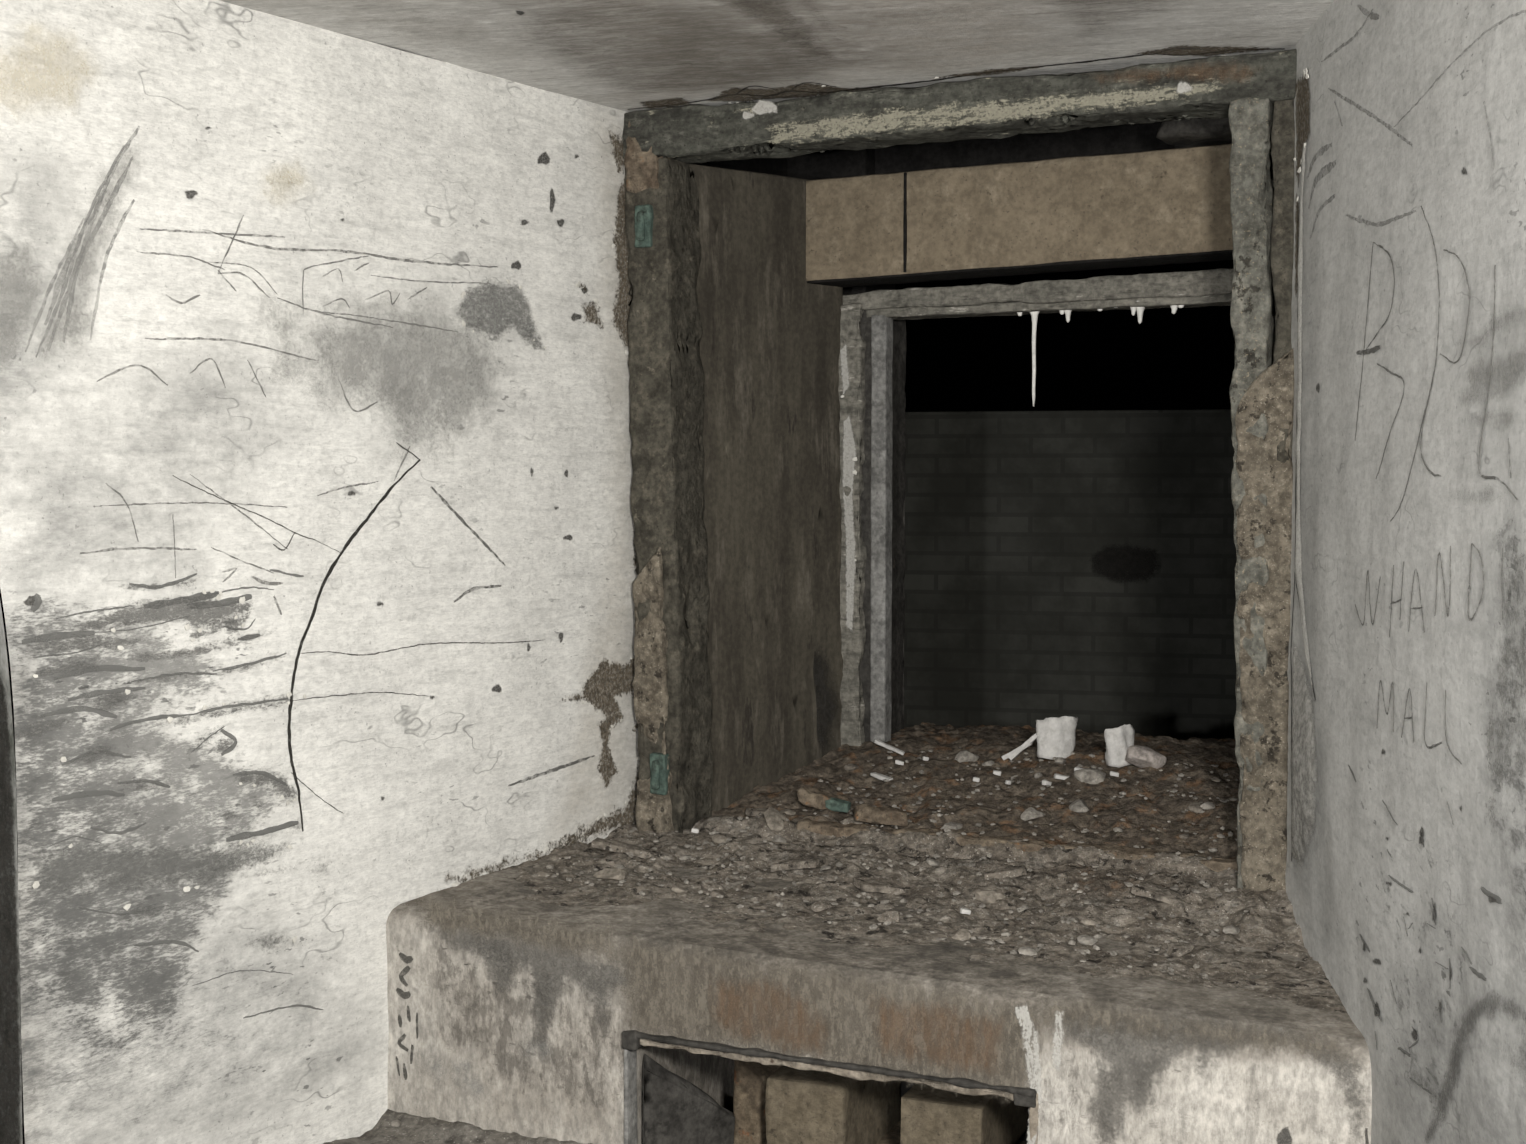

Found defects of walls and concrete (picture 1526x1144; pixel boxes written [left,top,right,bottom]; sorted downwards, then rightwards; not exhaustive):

water stain [320,319,483,429]
spalling [444,656,639,887]
water stain [426,900,1337,1095]
water stain [1090,1062,1153,1141]